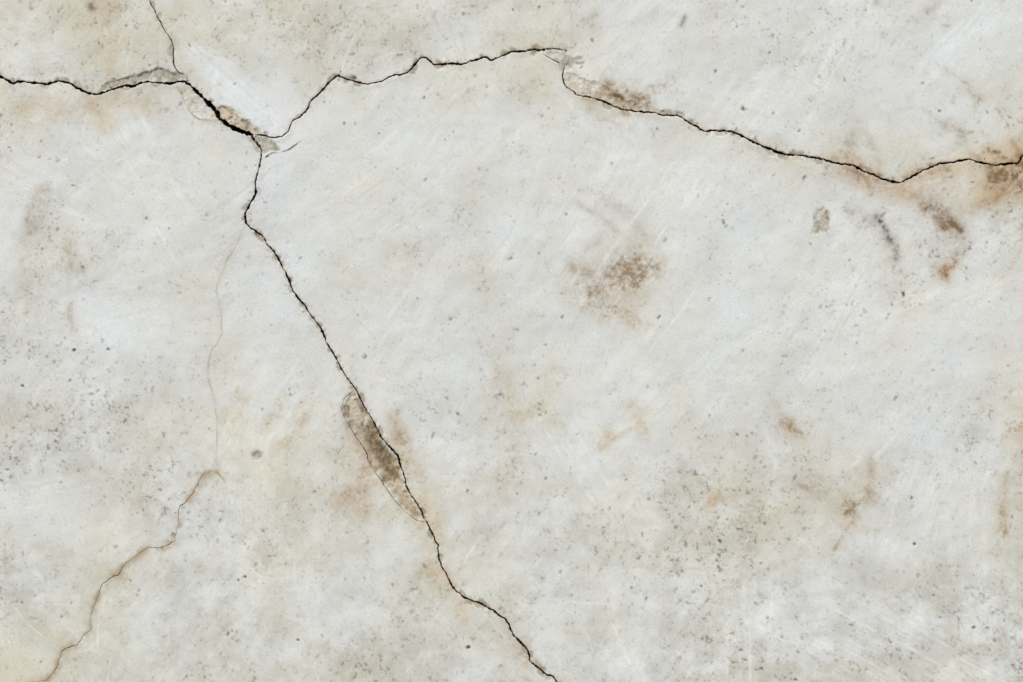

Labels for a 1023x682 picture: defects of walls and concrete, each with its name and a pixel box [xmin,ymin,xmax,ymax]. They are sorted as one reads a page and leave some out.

crack [0,0,1023,188]
crack [29,133,565,682]
spalling [336,388,427,527]